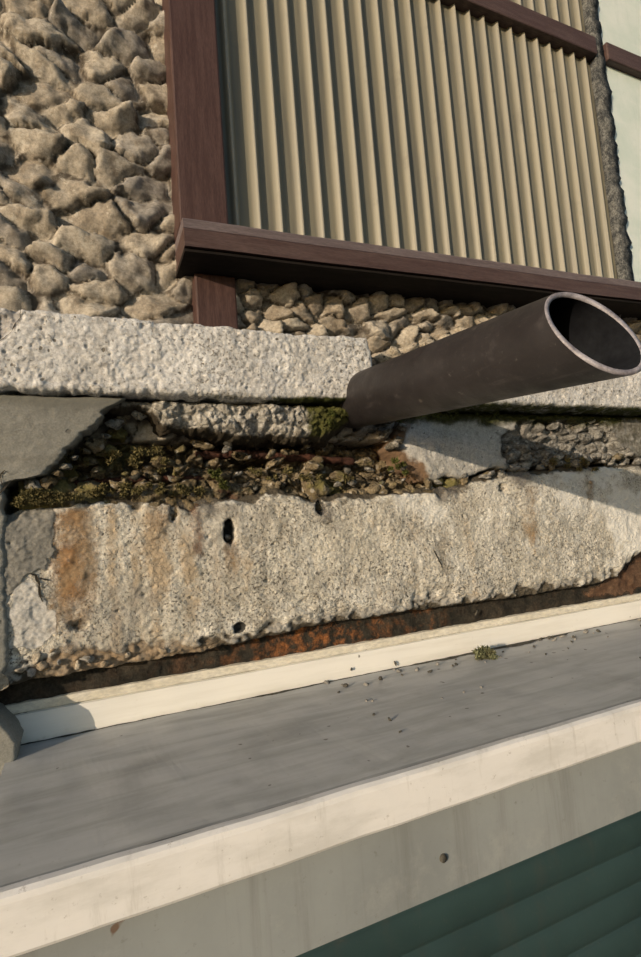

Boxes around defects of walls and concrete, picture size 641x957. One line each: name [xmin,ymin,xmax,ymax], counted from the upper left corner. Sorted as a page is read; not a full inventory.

rust [54,508,96,607]
spalling [3,401,641,597]